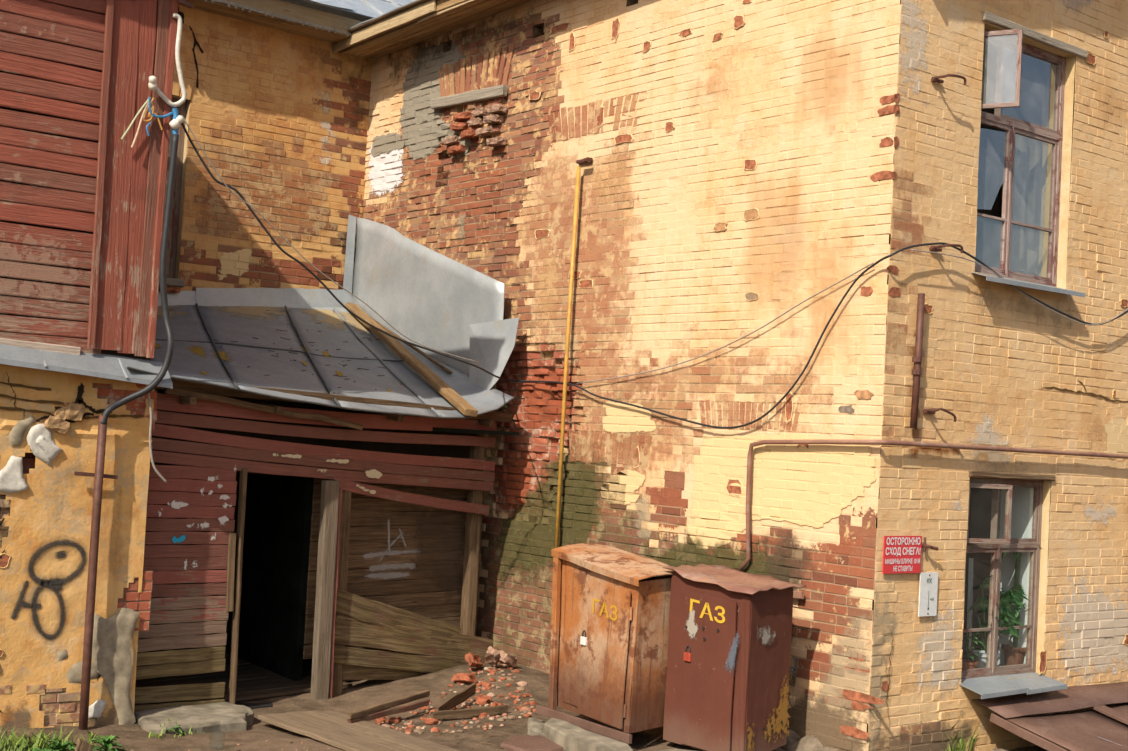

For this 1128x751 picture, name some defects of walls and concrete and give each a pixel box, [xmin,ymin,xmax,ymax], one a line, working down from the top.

crack [178,5,204,88]
flaking render [886,265,907,353]
flaking render [179,12,877,705]
crack [1041,380,1128,402]
flaking render [117,571,153,631]
flaking render [26,684,81,727]